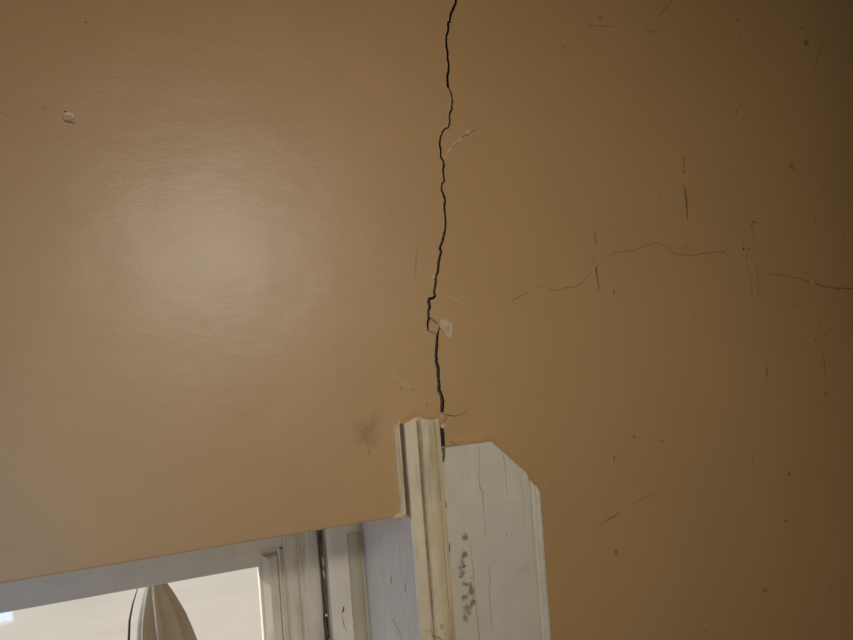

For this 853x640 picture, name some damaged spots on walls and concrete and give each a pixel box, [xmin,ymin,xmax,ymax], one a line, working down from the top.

crack [427,0,466,418]